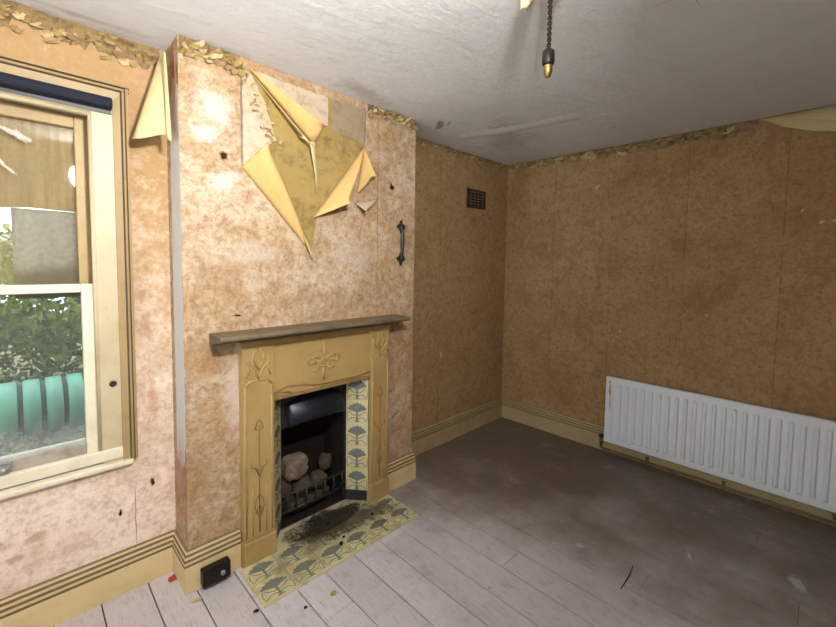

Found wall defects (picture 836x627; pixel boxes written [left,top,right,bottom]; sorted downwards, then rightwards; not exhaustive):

peeling [0,0,159,71]
flaking render [178,35,365,254]